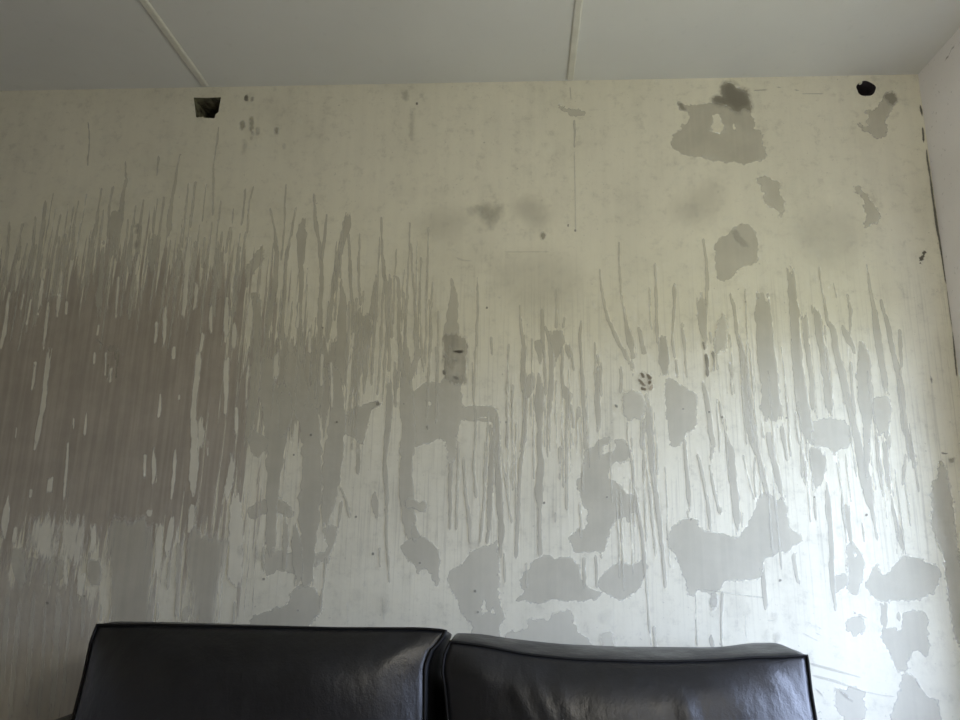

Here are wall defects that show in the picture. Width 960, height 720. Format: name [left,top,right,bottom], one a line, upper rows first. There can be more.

peeling [671,82,767,165]
peeling [858,92,897,139]
peeling [758,176,784,217]
peeling [855,186,880,227]
peeling [714,224,759,281]
peeling [336,401,380,474]
peeling [401,346,648,645]
peeling [638,335,803,647]
peeling [250,584,322,626]
peeling [810,417,960,720]